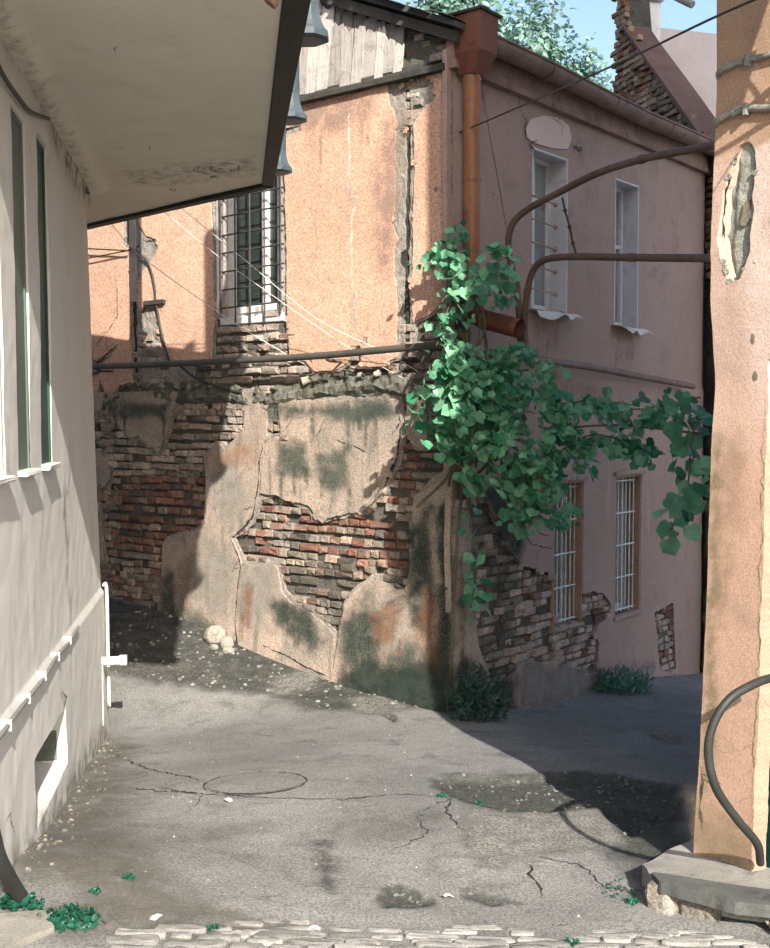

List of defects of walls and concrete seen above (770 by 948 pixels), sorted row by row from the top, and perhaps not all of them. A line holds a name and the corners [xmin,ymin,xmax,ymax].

flaking render [399,79,430,133]
flaking render [721,143,759,284]
flaking render [191,306,314,389]
flaking render [327,295,472,376]
flaking render [94,403,243,607]
flaking render [240,435,443,631]
damp [421,502,454,713]
flaking render [455,460,610,681]